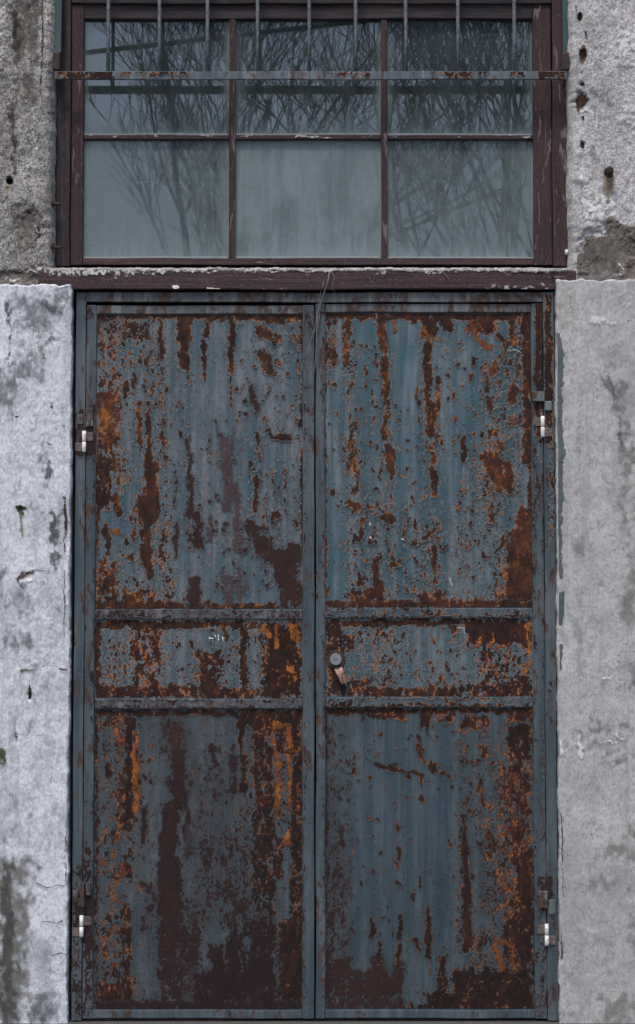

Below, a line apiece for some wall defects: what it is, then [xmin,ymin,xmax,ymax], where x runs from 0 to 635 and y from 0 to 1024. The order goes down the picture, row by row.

leakage [0,857,56,1024]
rust [72,294,555,1017]